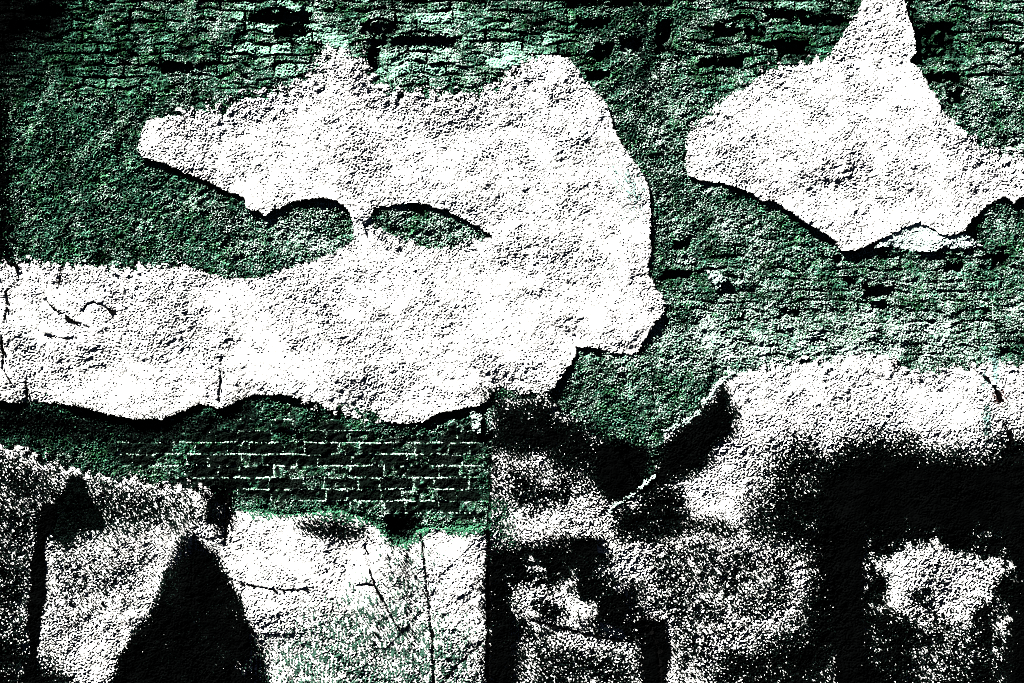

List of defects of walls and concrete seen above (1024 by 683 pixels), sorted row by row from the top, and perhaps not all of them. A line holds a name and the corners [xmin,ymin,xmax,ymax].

peeling [0,0,862,281]
peeling [905,0,1024,164]
crack [46,260,116,340]
peeling [0,185,1024,556]